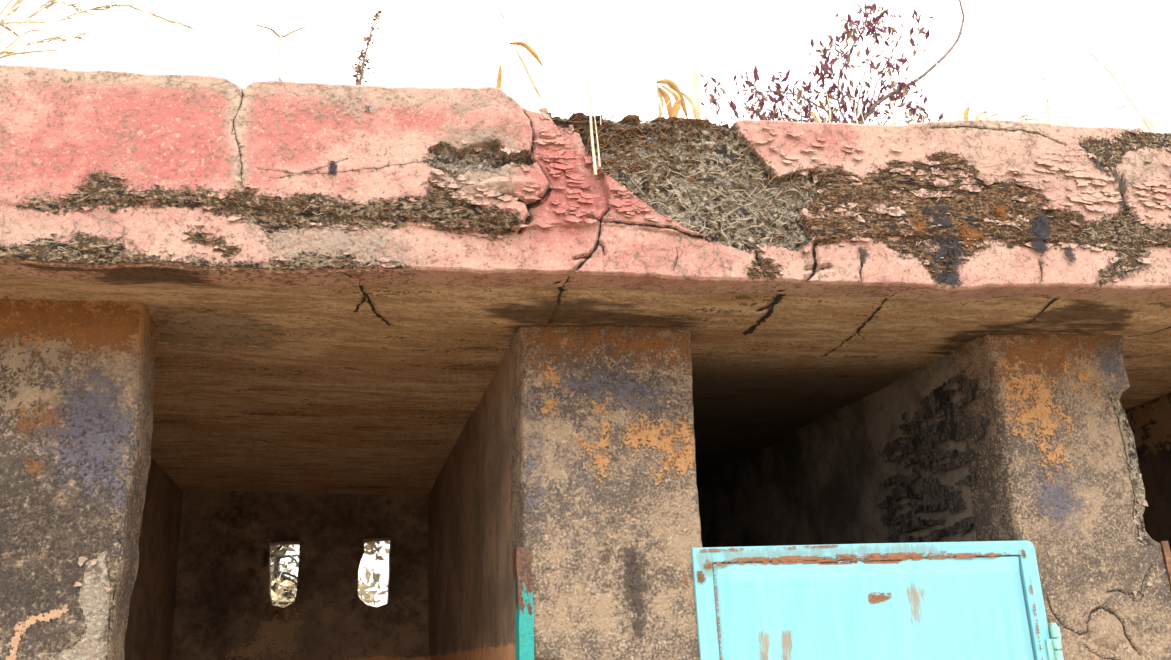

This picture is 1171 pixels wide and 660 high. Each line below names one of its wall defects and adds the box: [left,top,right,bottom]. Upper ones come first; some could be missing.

crack [231,91,429,186]
spalling [0,107,1171,284]
crack [344,273,391,326]
crack [744,244,828,335]
crack [822,258,921,357]
spalling [6,552,112,660]
corrosion [685,545,1026,660]
crack [1047,590,1140,660]